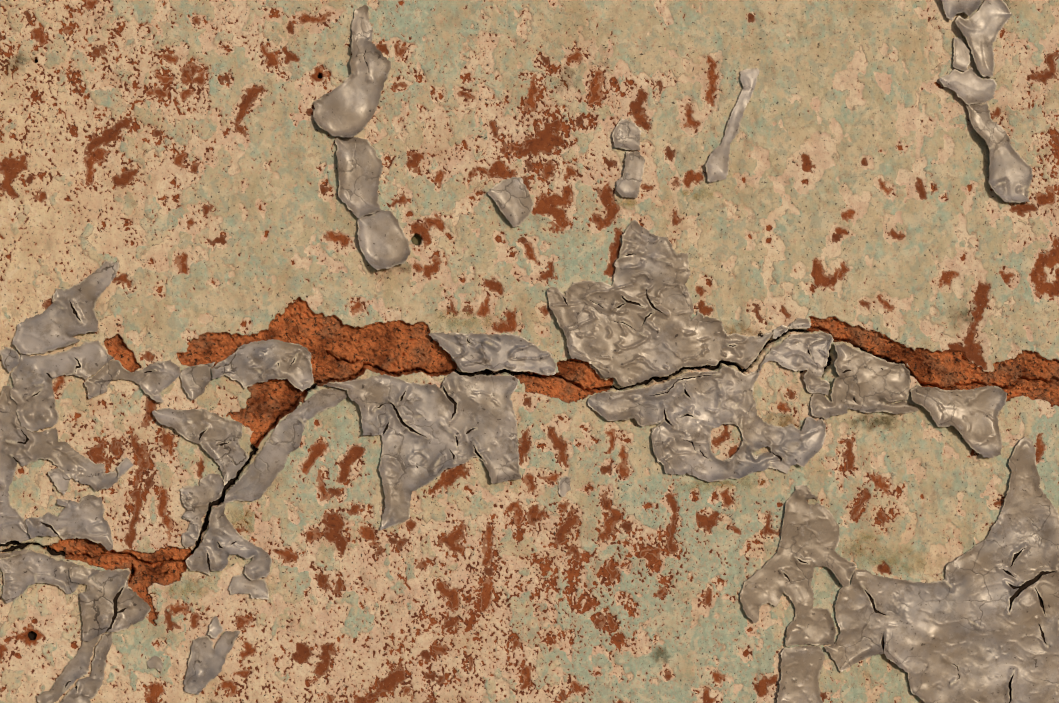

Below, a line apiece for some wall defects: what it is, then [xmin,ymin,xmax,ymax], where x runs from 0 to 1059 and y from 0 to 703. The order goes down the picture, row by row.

peeling [468,119,578,234]
peeling [592,89,654,230]
peeling [672,68,759,188]
spalling [832,209,855,243]
peeling [939,0,1059,217]
crack [455,369,542,377]
crack [598,328,809,390]
crack [800,340,912,376]
crack [0,540,66,557]
crack [191,433,267,554]